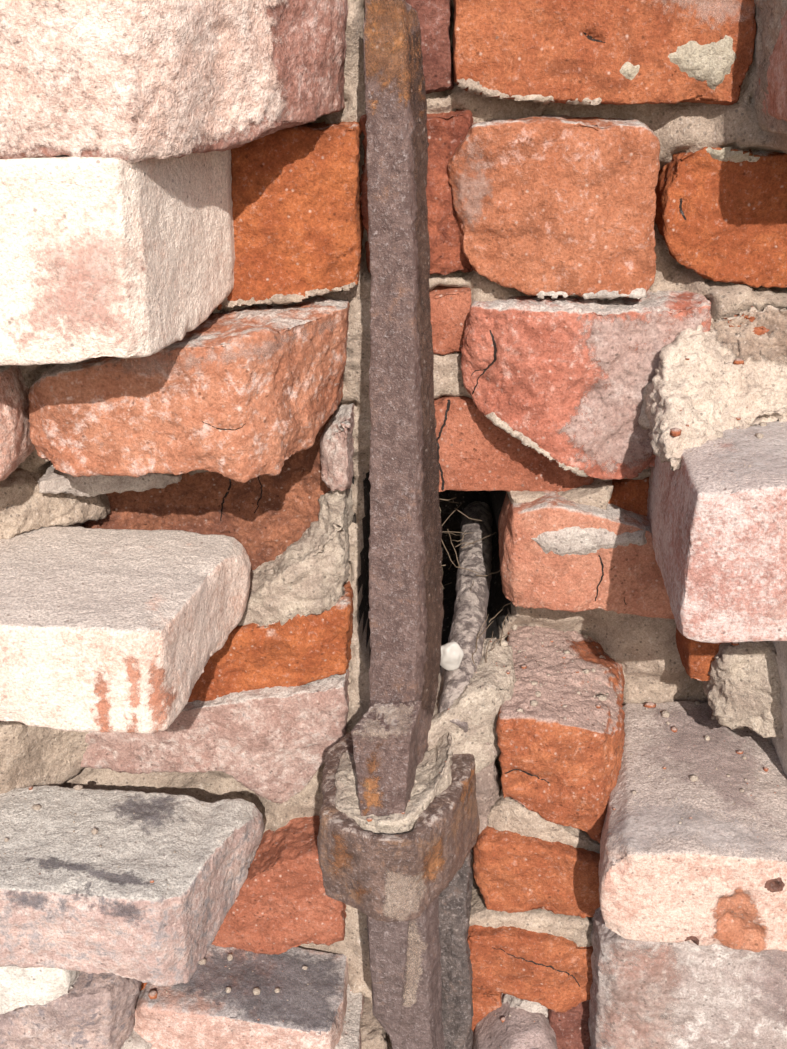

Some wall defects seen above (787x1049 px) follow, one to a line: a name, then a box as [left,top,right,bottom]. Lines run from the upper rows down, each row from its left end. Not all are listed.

rust [364,0,444,716]
crack [437,330,497,491]
crack [220,479,232,521]
crack [595,555,604,601]
rust [362,744,382,815]
crack [492,947,580,987]